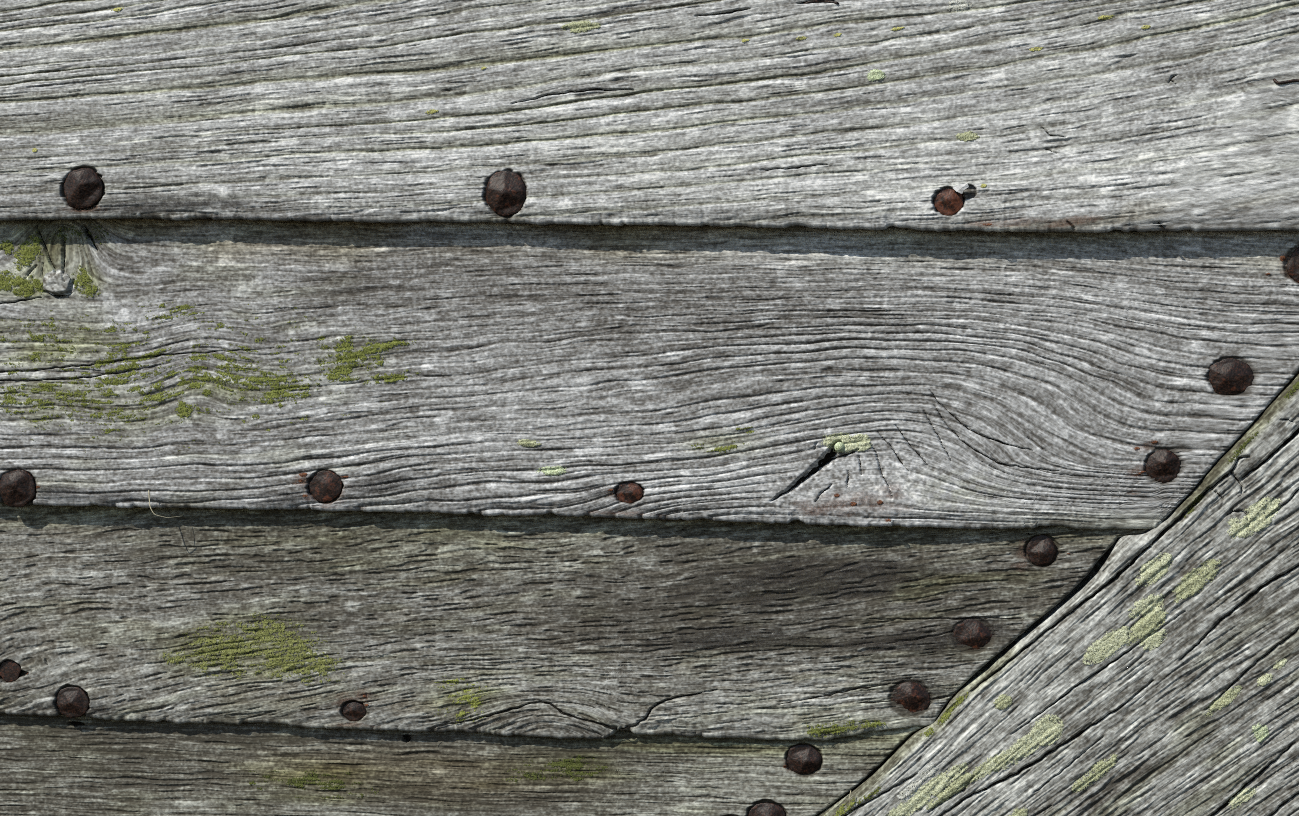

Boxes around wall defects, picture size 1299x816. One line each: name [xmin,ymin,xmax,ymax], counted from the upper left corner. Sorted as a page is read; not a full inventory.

crack [772,393,1059,501]
crack [428,689,717,732]